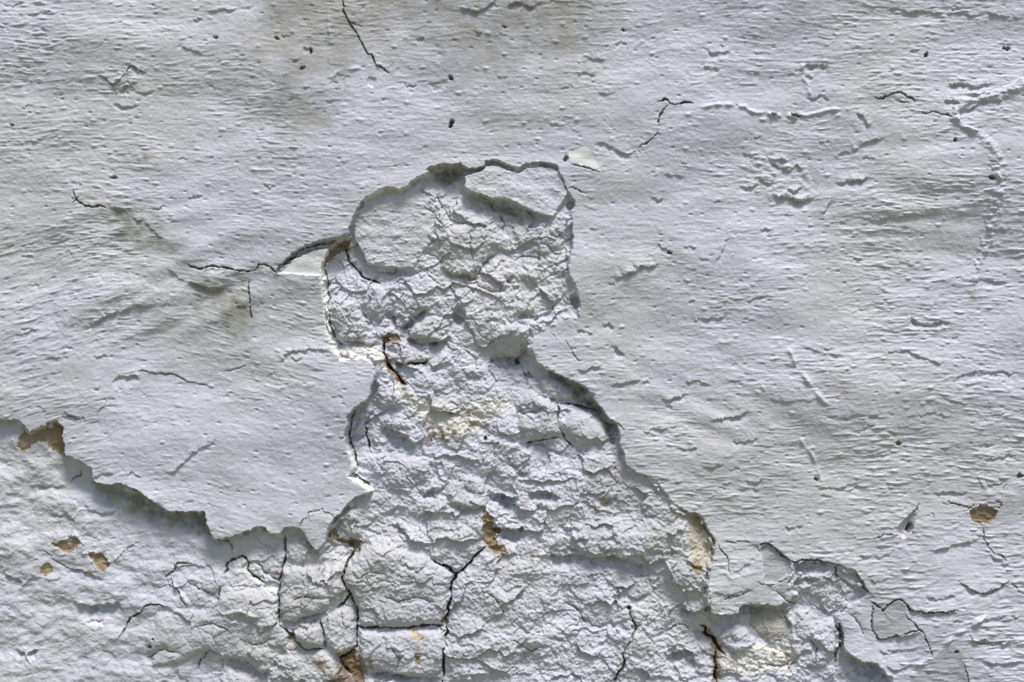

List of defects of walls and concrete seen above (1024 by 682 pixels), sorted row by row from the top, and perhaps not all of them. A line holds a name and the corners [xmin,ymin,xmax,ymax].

crack [343,4,386,71]
crack [190,243,413,345]
crack [423,193,508,293]
crack [512,243,563,263]
spalling [0,146,920,682]
peeling [969,503,998,525]
crack [119,508,486,679]
crack [614,609,638,682]
crack [665,531,1009,682]